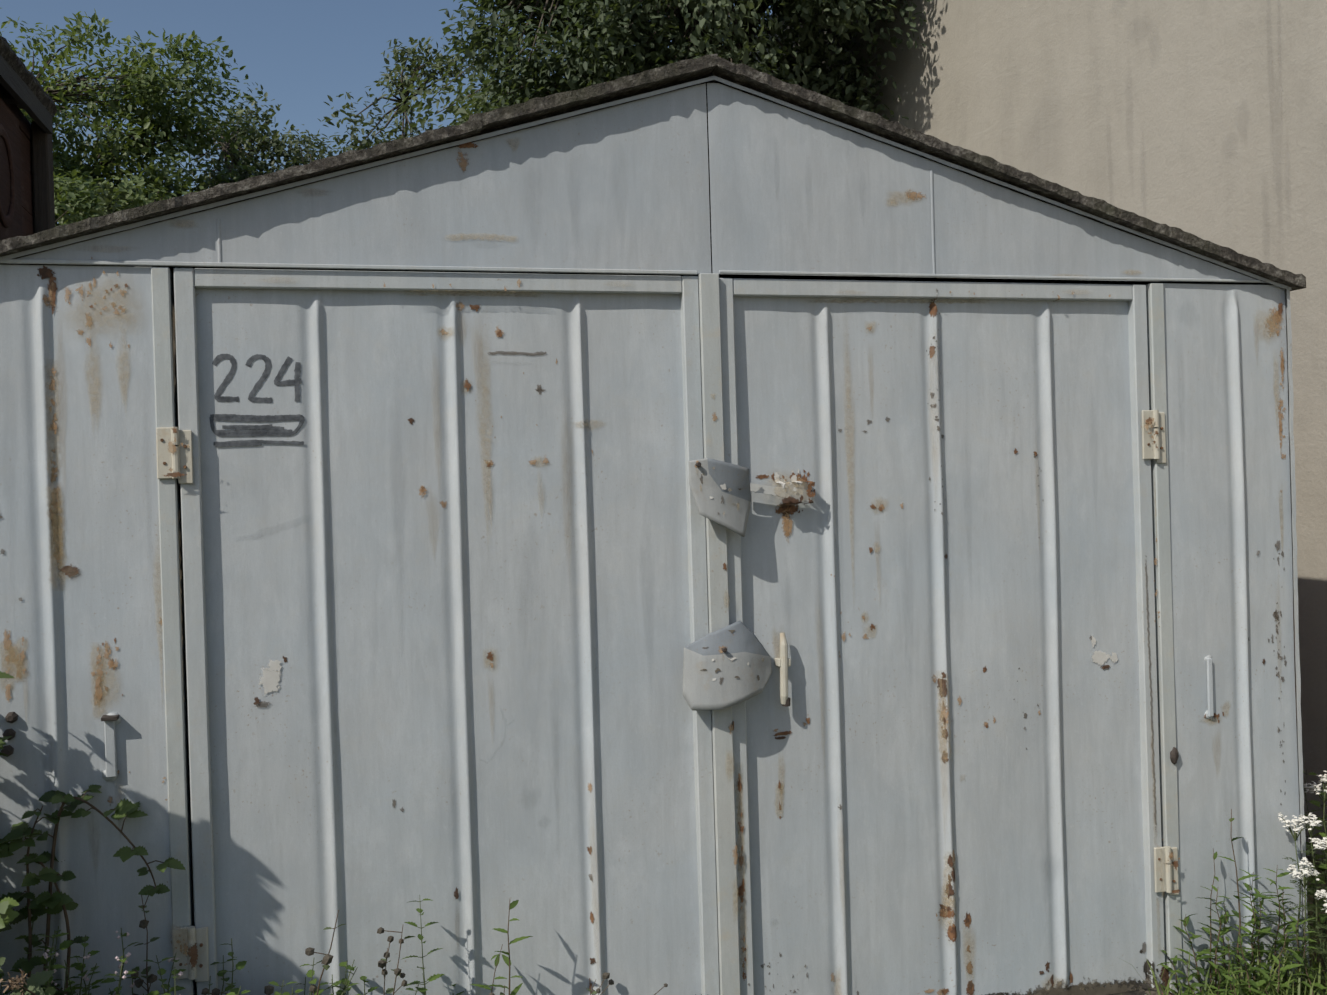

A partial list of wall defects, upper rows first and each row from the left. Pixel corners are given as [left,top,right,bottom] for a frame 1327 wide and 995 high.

corrosion [37,264,128,346]
corrosion [1267,303,1286,458]
corrosion [49,368,61,568]
corrosion [755,469,815,537]
corrosion [91,638,123,705]
peeling [254,656,287,708]
corrosion [773,718,810,739]
corrosion [932,672,962,763]
peeling [1090,636,1118,669]
corrosion [733,812,745,909]
corrosion [936,849,975,995]
corrosion [1039,961,1073,987]